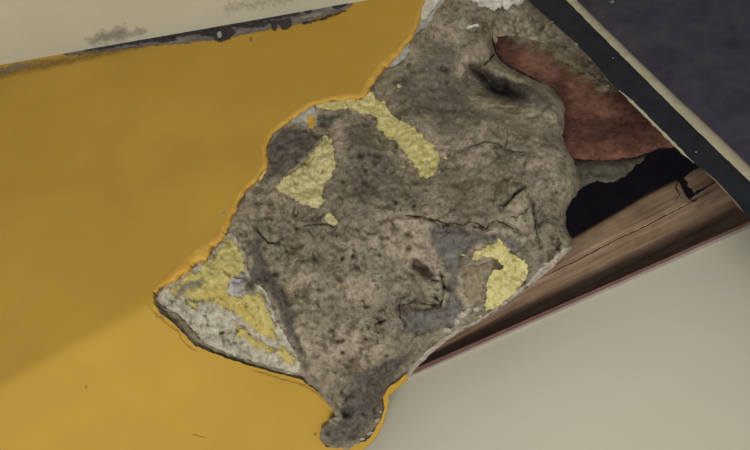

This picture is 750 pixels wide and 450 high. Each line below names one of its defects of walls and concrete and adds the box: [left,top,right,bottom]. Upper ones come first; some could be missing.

damp [0,3,352,76]
spalling [153,0,742,450]
crack [402,186,563,243]
crack [376,275,444,333]